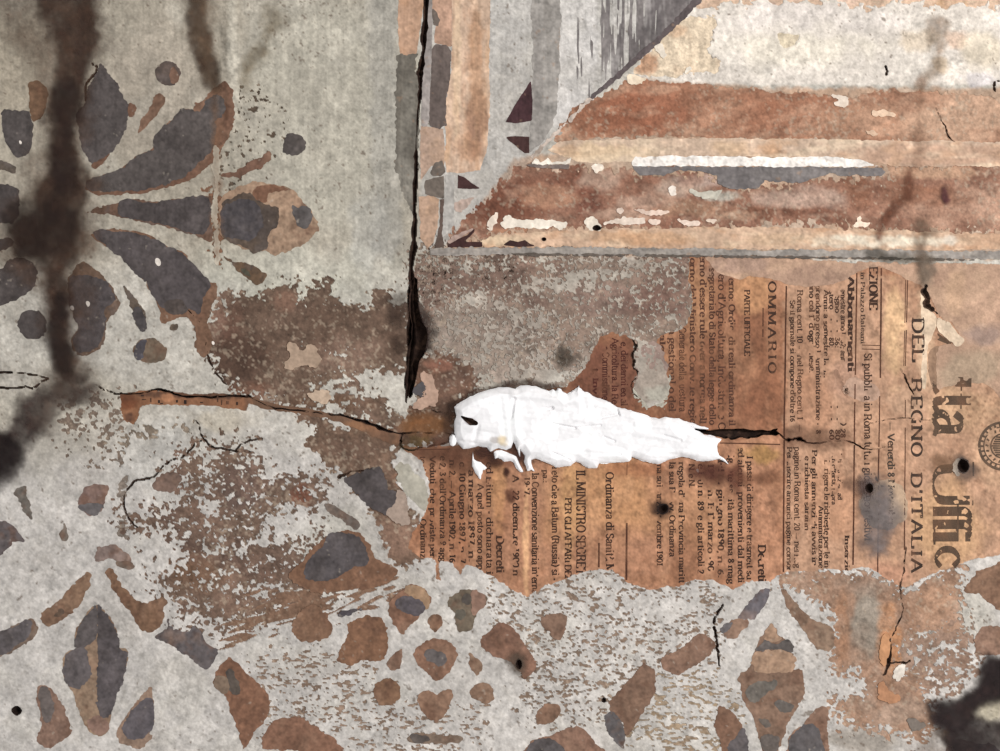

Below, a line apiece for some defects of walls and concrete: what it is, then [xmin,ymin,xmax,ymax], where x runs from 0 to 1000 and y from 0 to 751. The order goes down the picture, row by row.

water stain [0,0,98,480]
crack [99,0,452,451]
crack [123,422,263,528]
peeling [51,161,1000,751]
crack [695,428,885,450]
crack [713,605,723,666]
crack [883,547,907,676]
water stain [928,655,1000,751]